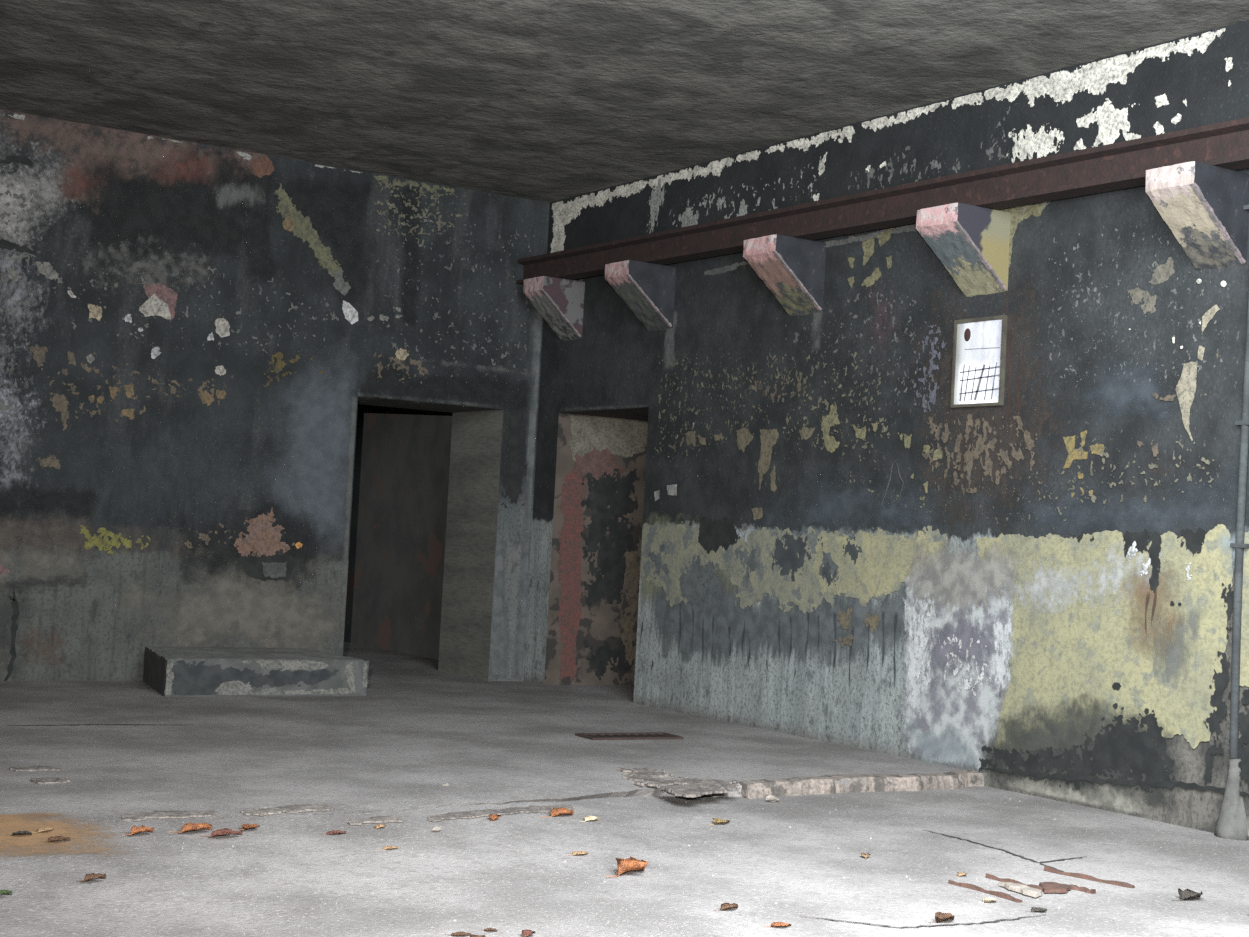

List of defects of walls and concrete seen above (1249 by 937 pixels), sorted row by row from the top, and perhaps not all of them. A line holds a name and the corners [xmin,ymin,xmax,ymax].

crack [0,239,36,255]
leakage [0,138,77,490]
peeling [29,151,535,434]
peeling [550,28,1225,253]
peeling [557,224,1249,749]
crack [4,588,19,681]
spalling [738,770,984,799]